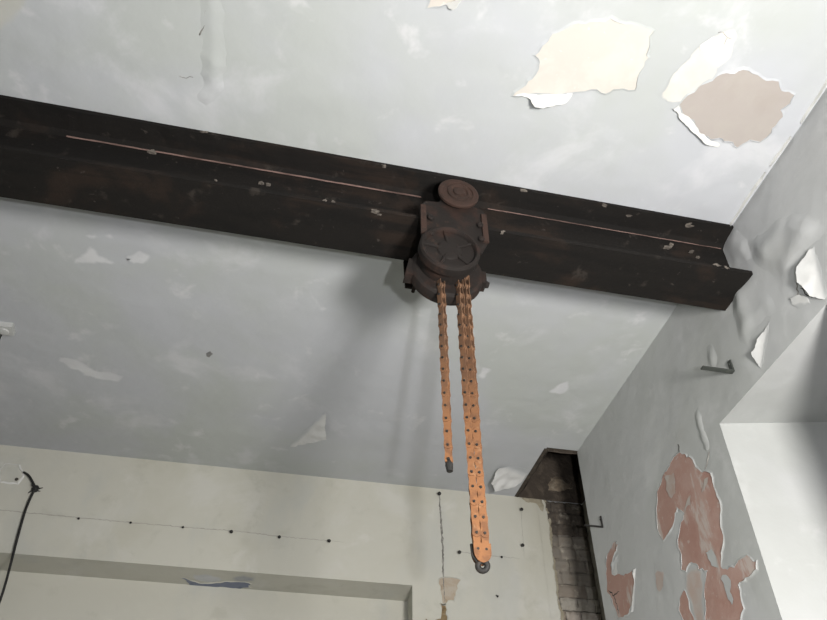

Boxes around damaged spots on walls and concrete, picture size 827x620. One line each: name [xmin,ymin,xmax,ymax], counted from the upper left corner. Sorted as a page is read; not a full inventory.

peeling [510,14,656,108]
peeling [658,28,797,149]
peeling [790,247,827,308]
peeling [491,466,528,492]
spalling [424,576,462,620]
spalling [522,498,636,620]
peeling [655,445,759,620]